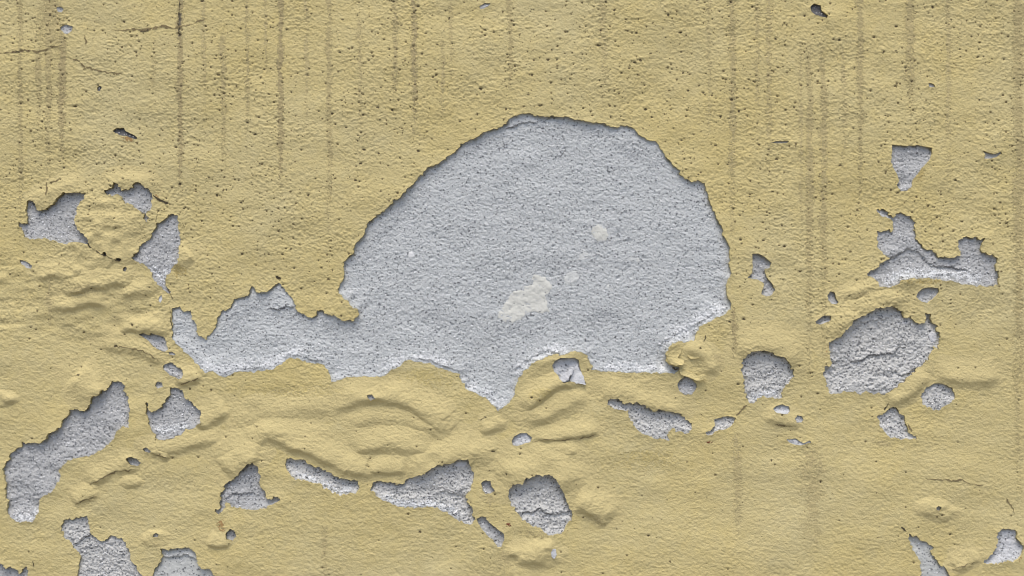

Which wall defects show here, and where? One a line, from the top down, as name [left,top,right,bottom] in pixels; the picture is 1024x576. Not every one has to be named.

spalling [891,145,931,193]
spalling [19,193,88,244]
spalling [104,183,185,306]
spalling [131,104,746,441]
spalling [823,209,998,395]
spalling [737,351,803,423]
spalling [4,381,130,523]
spalling [215,463,280,515]
spalling [285,458,504,547]
spalling [505,474,572,536]
spalling [61,516,215,576]
spalling [908,527,949,576]